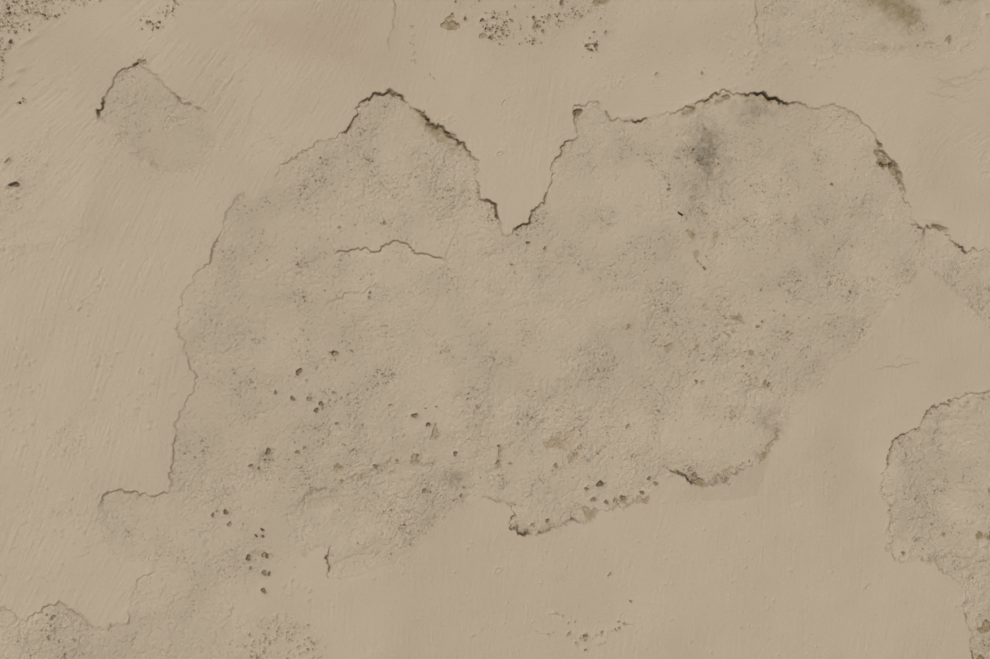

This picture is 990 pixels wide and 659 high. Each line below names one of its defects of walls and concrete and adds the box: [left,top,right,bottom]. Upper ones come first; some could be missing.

flaking render [754,0,983,61]
flaking render [96,88,990,599]
flaking render [0,567,234,659]
flaking render [879,391,990,659]